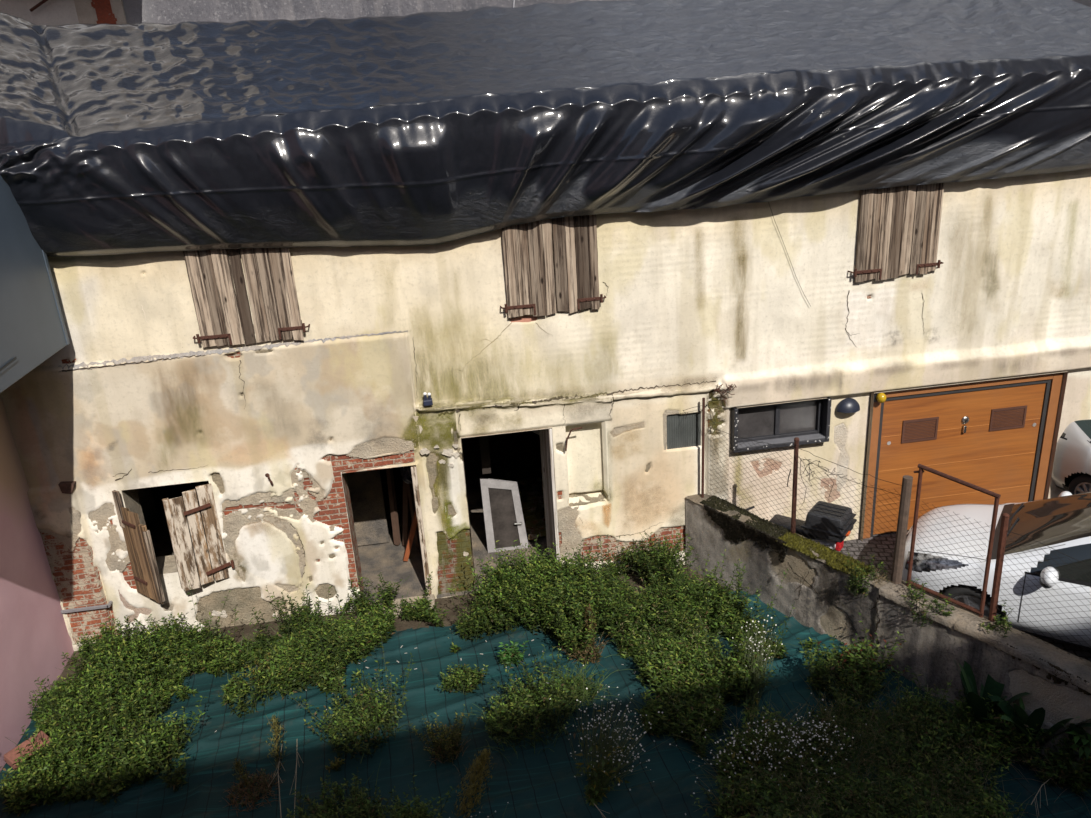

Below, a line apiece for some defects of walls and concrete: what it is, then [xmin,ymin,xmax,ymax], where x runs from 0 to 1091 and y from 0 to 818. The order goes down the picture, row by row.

flaking render [38,503,174,643]
flaking render [195,415,475,629]